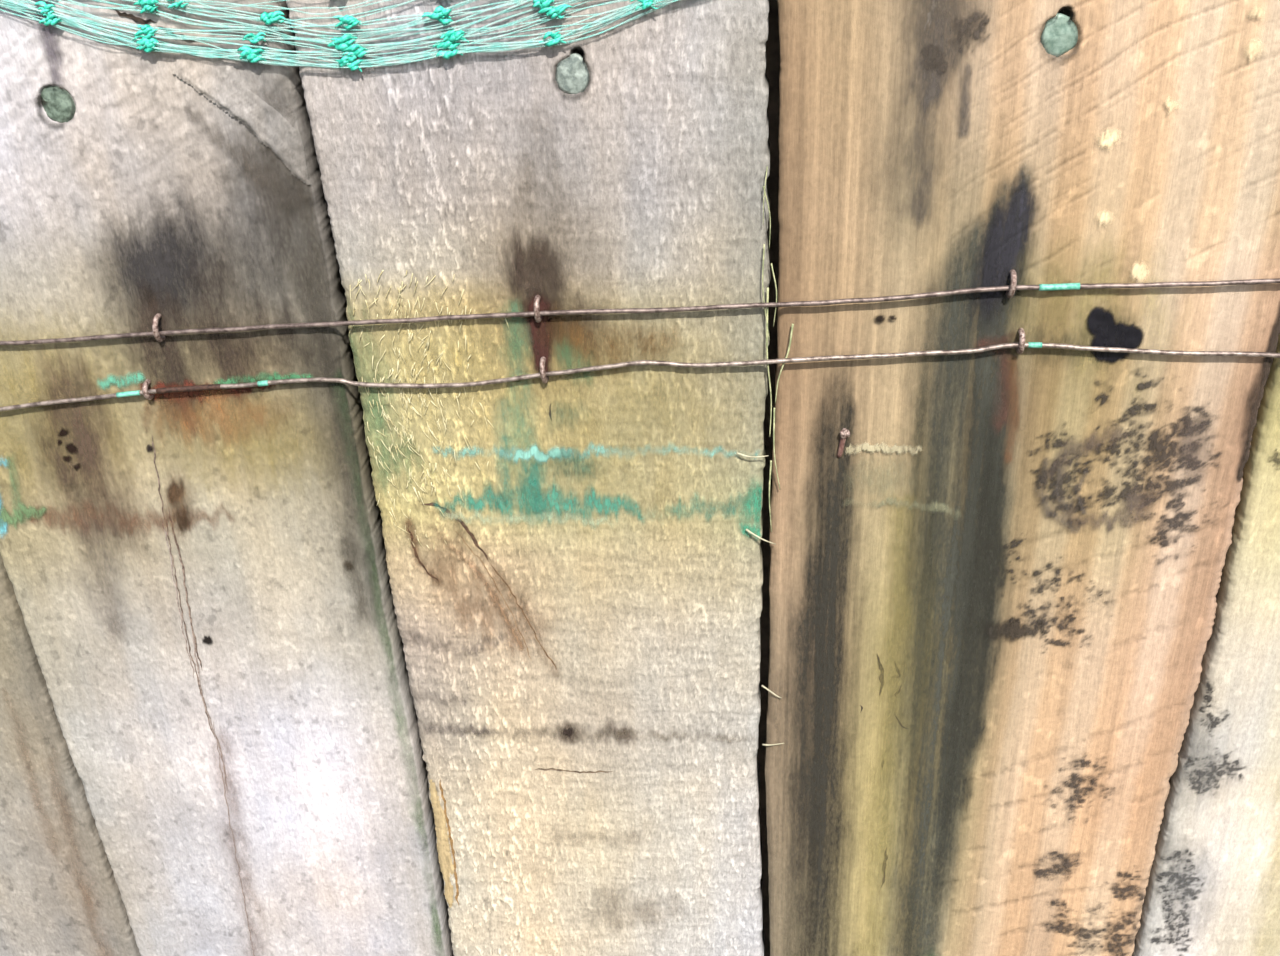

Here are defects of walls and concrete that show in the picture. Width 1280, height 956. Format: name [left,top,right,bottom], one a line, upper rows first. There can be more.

water stain [911,0,990,135]
water stain [114,209,293,420]
rust [141,378,275,434]
water stain [509,239,578,341]
rust [527,297,595,372]
water stain [1030,372,1221,559]
crack [406,502,557,670]
water stain [892,170,1114,956]
crack [152,434,255,956]
water stain [789,395,855,956]
water stain [1185,754,1245,794]
water stain [1046,850,1203,956]